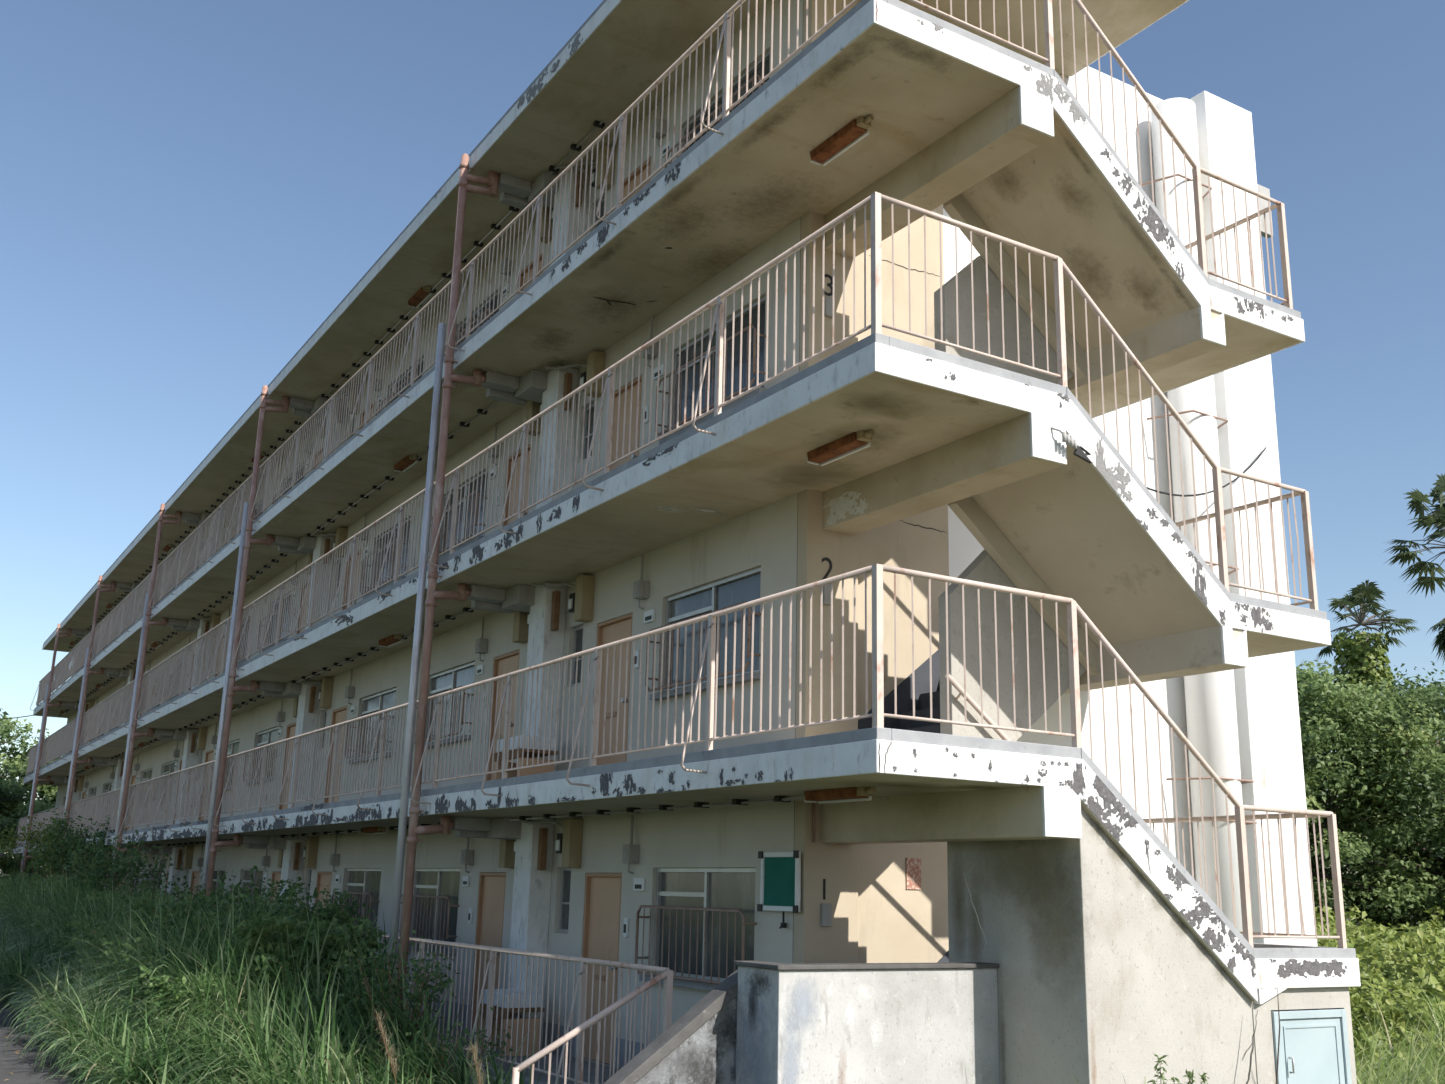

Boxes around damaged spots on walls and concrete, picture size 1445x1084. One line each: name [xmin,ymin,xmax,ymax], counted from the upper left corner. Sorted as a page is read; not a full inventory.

peeling [1024,65,1089,125]
peeling [551,161,681,280]
peeling [1100,148,1185,280]
peeling [1234,296,1294,322]
peeling [438,494,580,574]
spalling [823,491,868,527]
peeling [1095,438,1274,633]
peeling [717,767,792,786]
peeling [1022,761,1347,979]